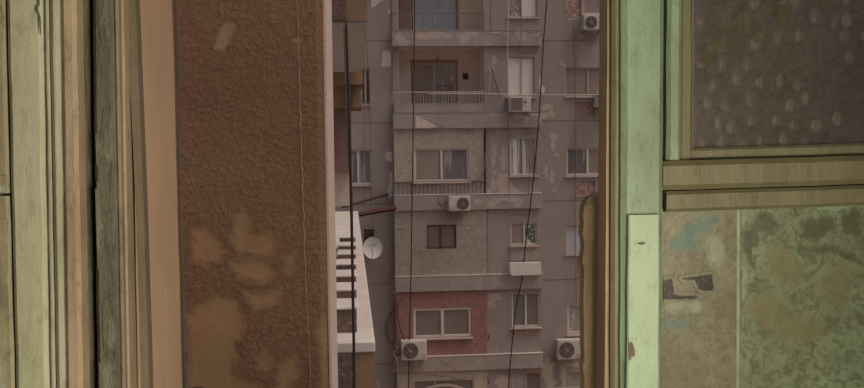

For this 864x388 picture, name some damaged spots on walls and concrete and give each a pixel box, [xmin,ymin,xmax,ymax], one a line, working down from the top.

peeling [379,31,481,68]
peeling [471,136,523,209]